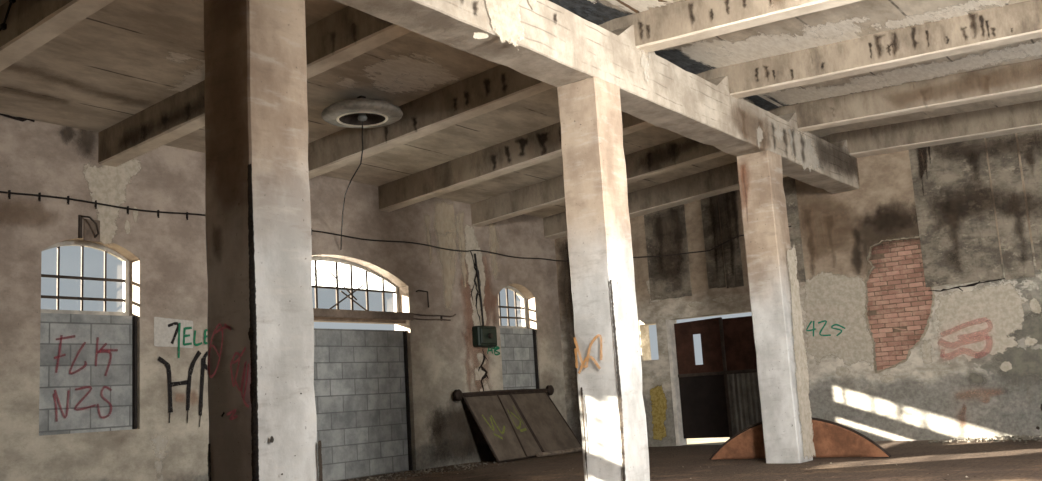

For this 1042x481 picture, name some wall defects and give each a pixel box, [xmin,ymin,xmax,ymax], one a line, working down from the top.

peeling [473,0,537,50]
peeling [588,0,685,14]
water stain [868,33,898,57]
water stain [961,14,995,39]
water stain [917,135,1042,266]
water stain [652,209,684,284]
water stain [710,191,738,270]
crack [470,251,482,325]
spalling [864,235,936,383]
peeling [1029,298,1041,314]
crack [478,351,489,391]